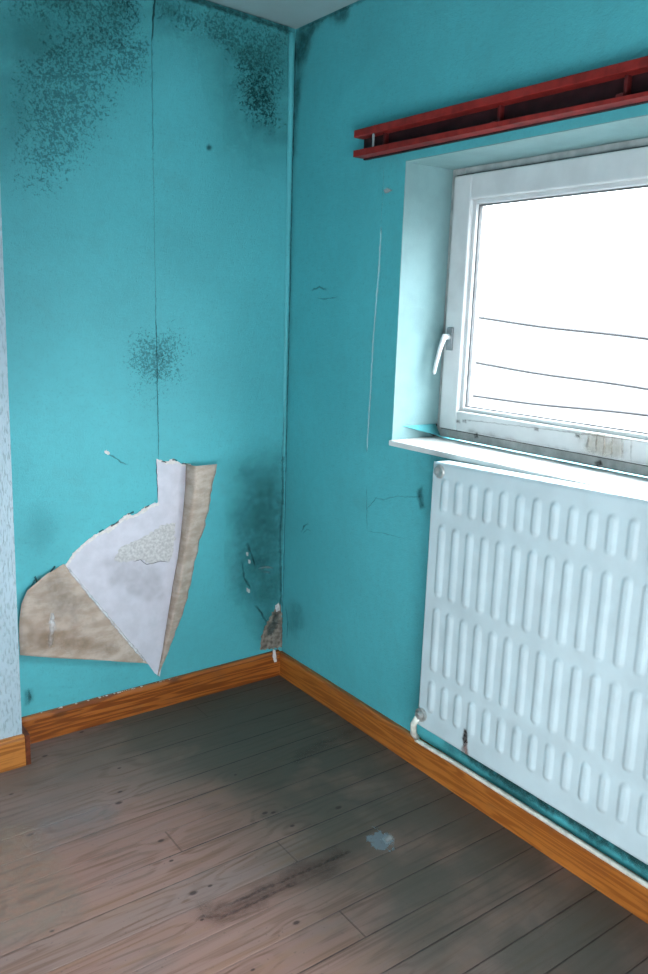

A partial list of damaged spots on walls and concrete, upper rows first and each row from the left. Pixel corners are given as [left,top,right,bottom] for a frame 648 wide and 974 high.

spalling [260,603,283,662]
damp [466,754,648,867]